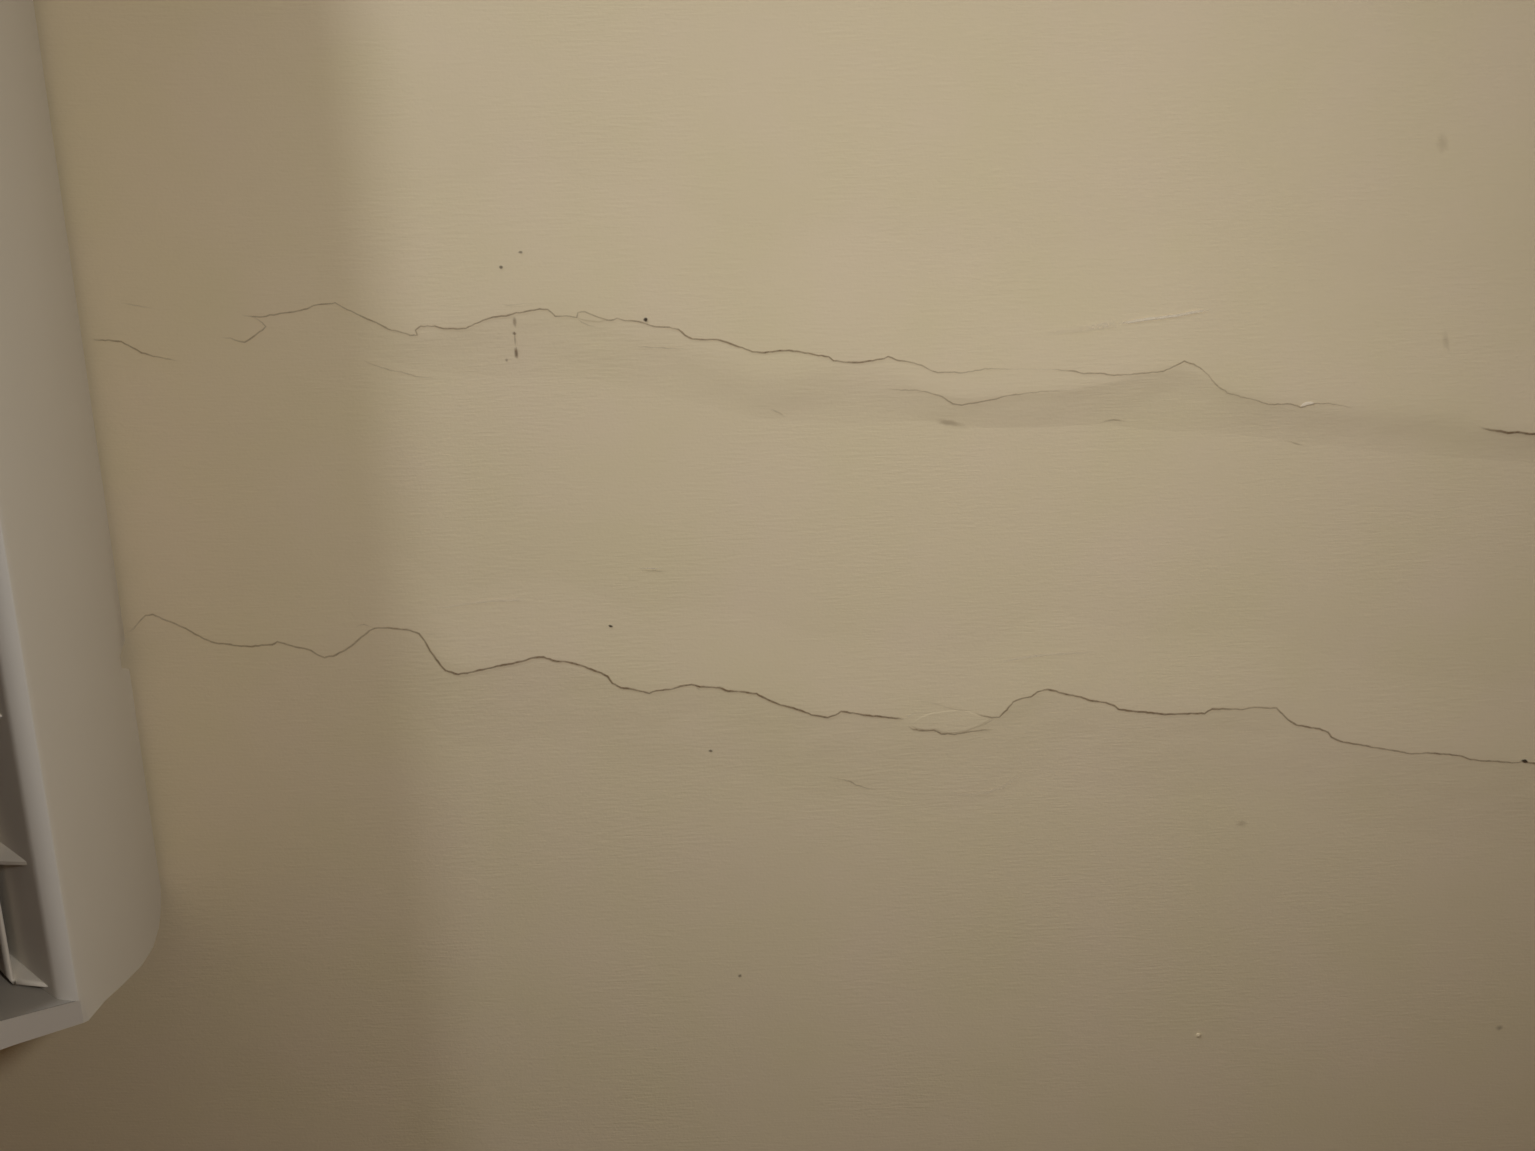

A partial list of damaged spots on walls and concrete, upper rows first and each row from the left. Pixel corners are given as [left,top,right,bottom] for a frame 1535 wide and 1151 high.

crack [682,332,889,363]
crack [1497,428,1535,436]
crack [427,645,1220,734]